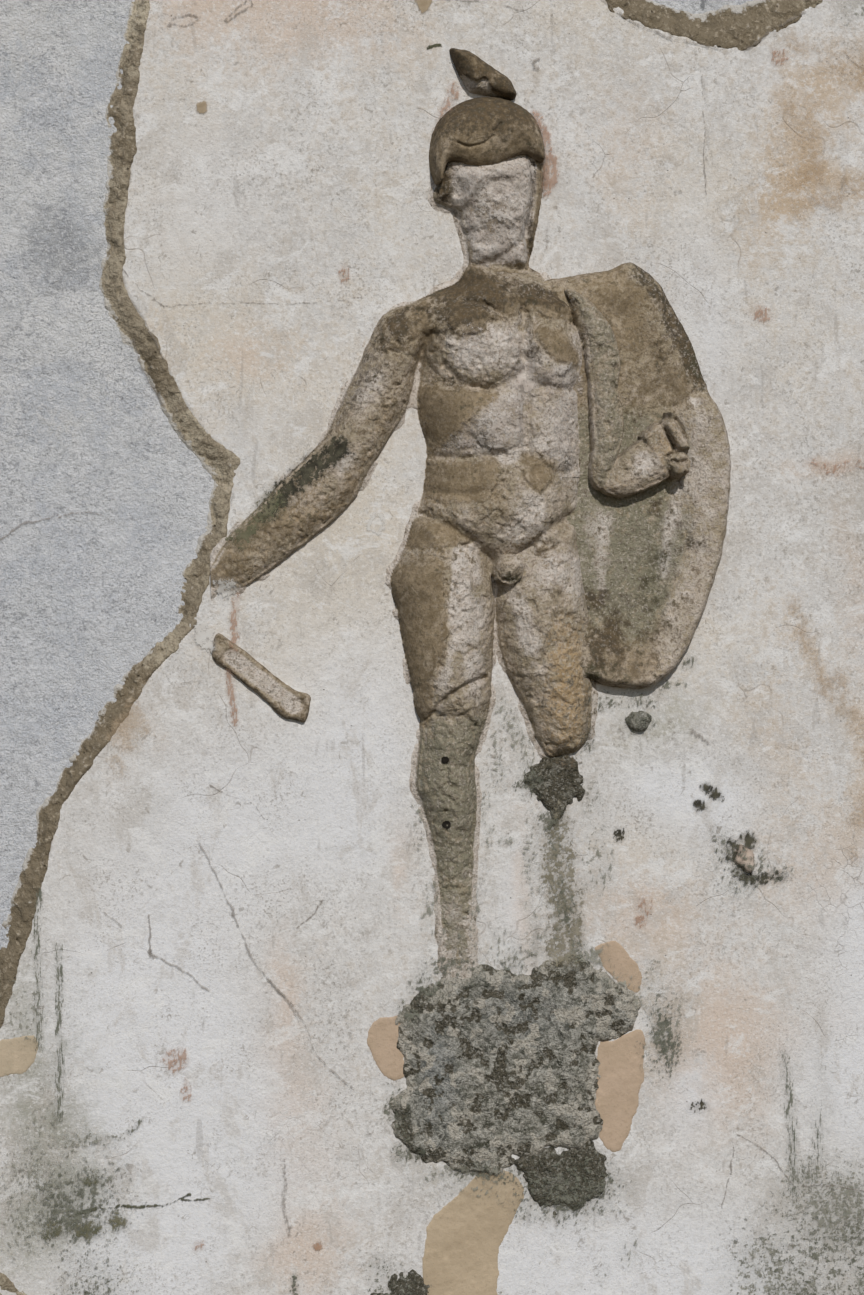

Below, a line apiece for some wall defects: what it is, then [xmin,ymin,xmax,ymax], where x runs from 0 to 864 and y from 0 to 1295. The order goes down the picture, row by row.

flaking render [197,101,207,113]
peeling [194,621,216,653]
damp [0,888,148,1295]
damp [730,1051,864,1295]